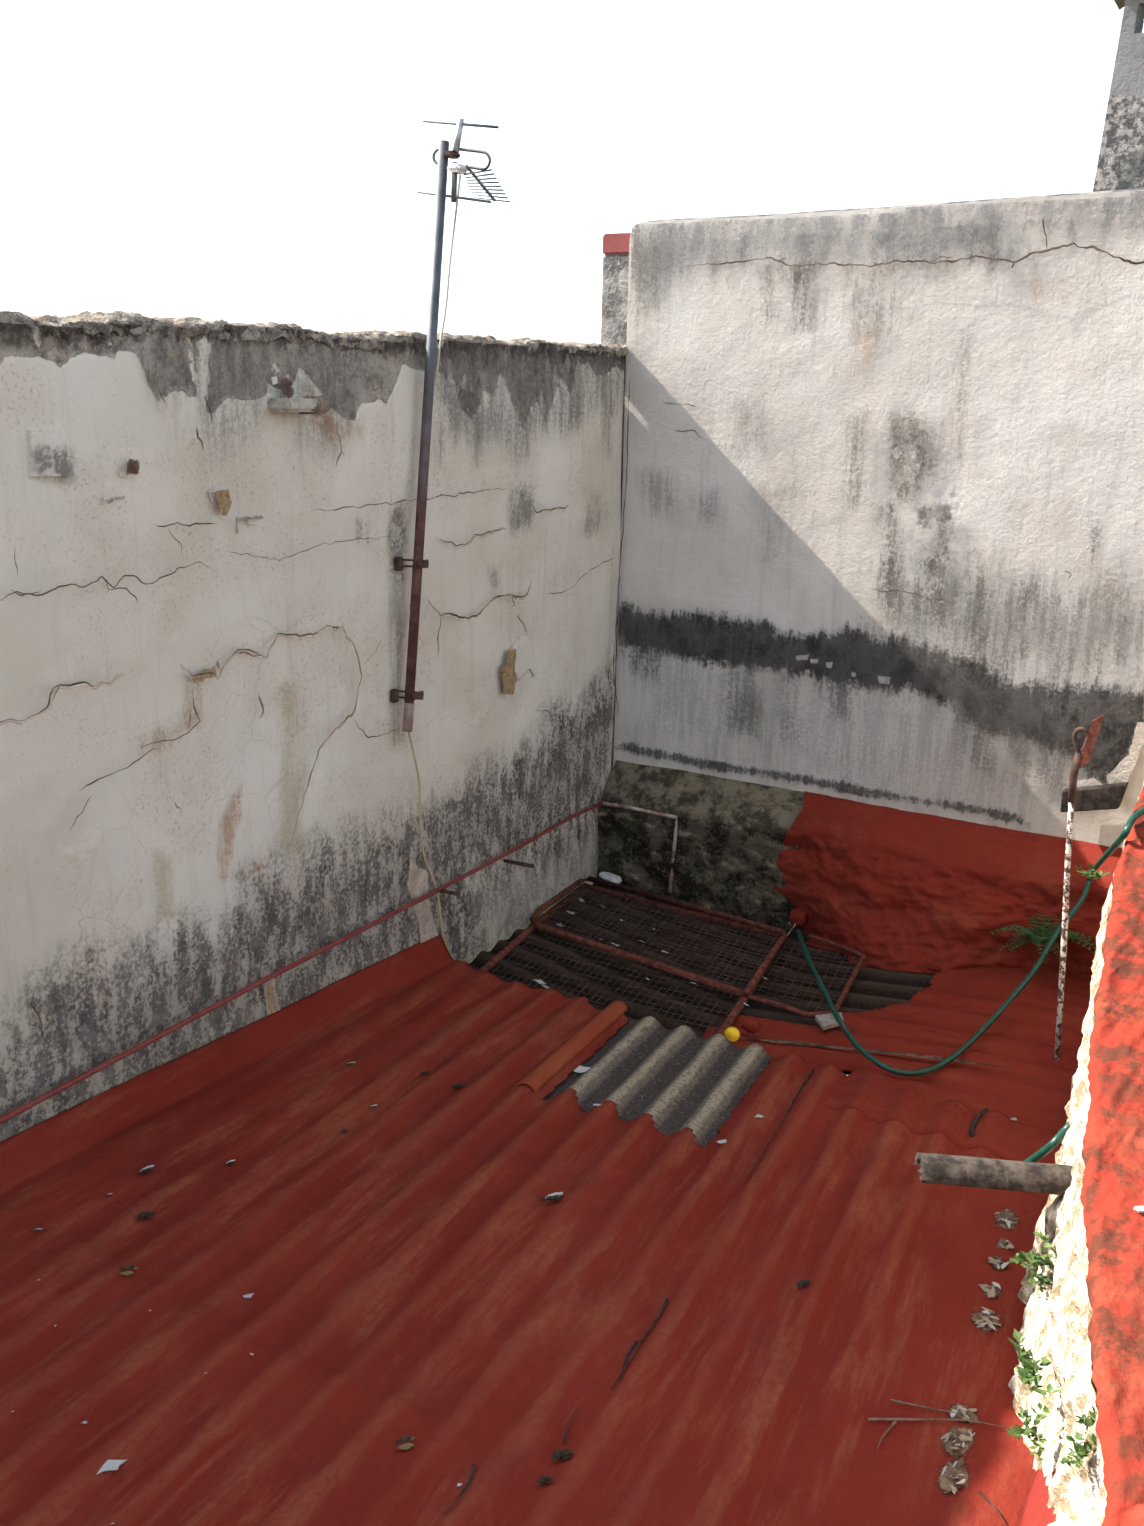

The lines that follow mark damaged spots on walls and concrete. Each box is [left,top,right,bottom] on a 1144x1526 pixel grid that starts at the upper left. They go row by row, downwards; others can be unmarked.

leakage [631,191,1144,327]
crack [678,218,1144,268]
crack [151,364,213,451]
flaking render [0,310,628,427]
crack [336,420,345,466]
crack [2,488,569,603]
crack [426,383,701,709]
leakage [618,414,1144,783]
crack [0,673,124,725]
crack [69,625,398,853]
spalling [500,635,539,694]
leakage [0,668,1023,1141]